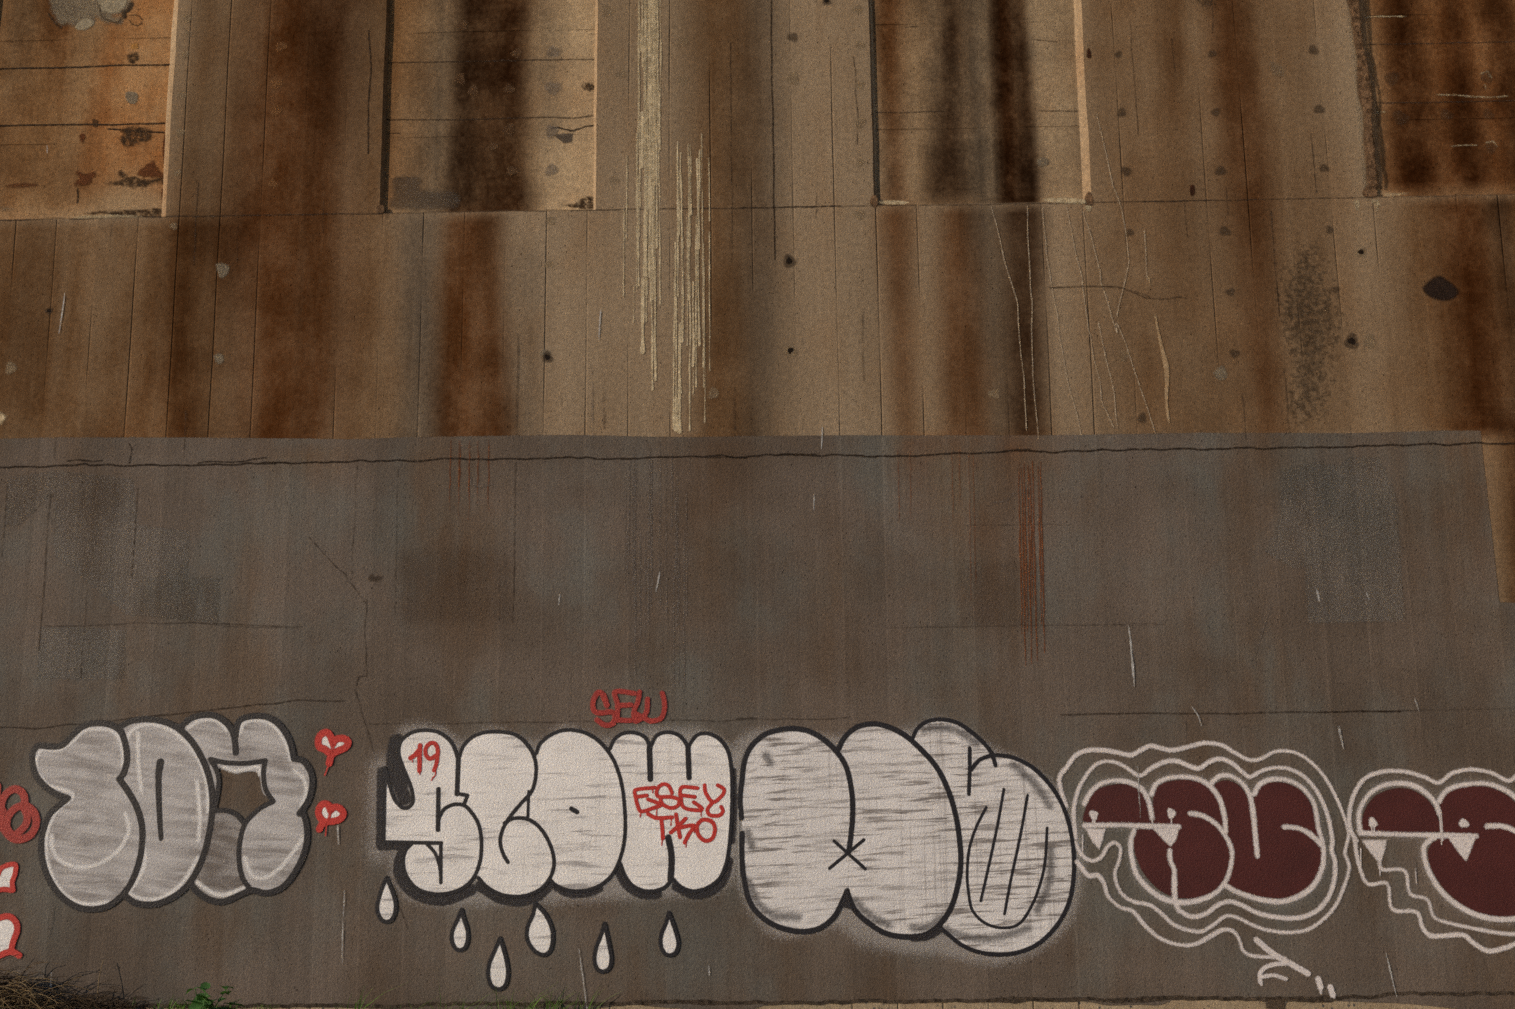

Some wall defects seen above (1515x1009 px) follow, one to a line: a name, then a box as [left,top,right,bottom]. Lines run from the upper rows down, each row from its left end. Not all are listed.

corrosion [941,13,958,190]
corrosion [1007,210,1039,435]